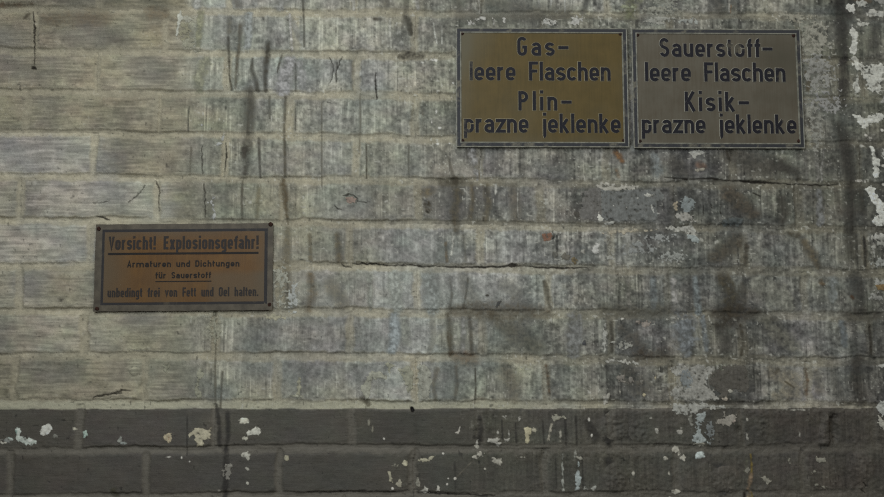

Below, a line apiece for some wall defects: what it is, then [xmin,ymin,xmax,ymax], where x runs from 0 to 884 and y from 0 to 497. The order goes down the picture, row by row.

leakage [242,0,307,178]
peeling [845,0,884,301]
peeling [0,424,58,445]
peeling [188,428,211,447]
peeling [239,418,261,440]
peeling [601,323,656,405]
peeling [668,363,748,426]
peeling [876,400,884,430]